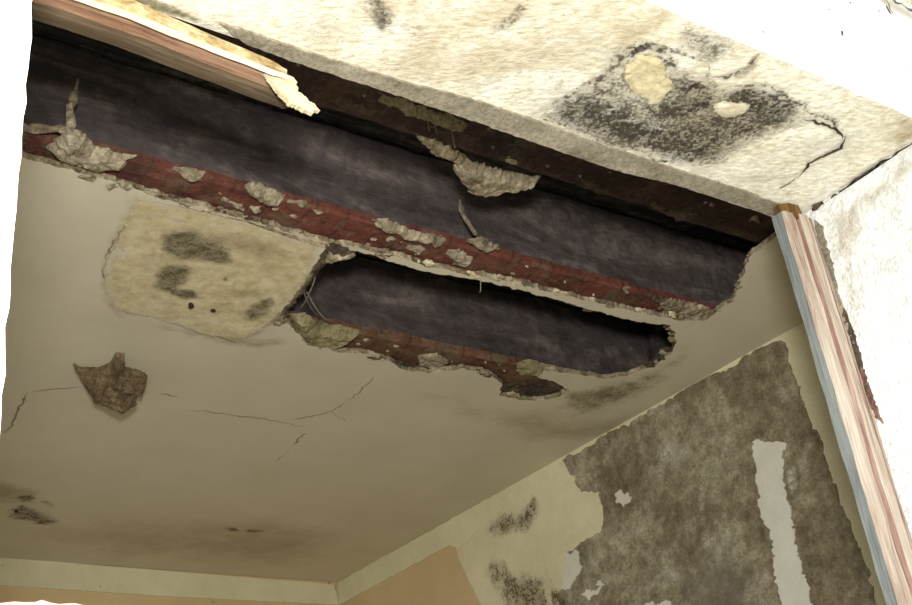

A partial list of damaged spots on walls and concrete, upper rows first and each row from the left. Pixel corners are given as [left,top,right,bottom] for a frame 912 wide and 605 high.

peeling [22,123,137,191]
peeling [172,166,205,182]
peeling [219,21,844,223]
leakage [556,30,845,163]
crack [778,119,845,190]
leakage [157,232,229,309]
peeling [372,218,615,313]
peeling [634,292,721,368]
flaking render [501,382,561,397]
flaking render [554,340,877,605]
leakage [490,499,535,533]
leakage [491,564,566,605]